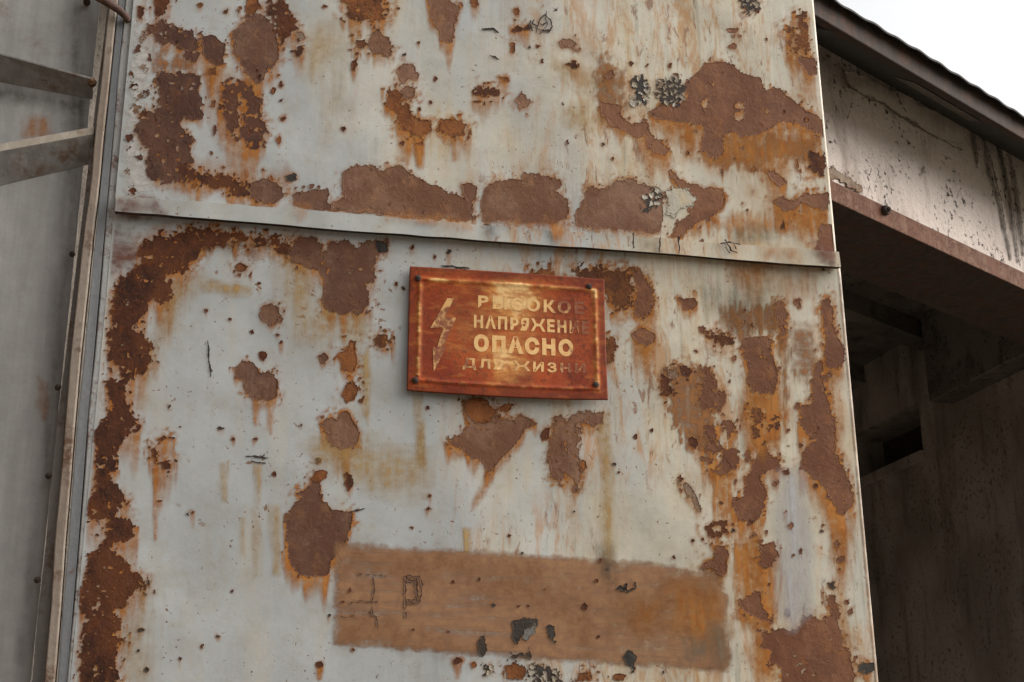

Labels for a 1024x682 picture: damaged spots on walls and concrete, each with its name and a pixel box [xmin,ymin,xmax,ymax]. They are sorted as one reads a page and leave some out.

peeling [122,13,824,240]
peeling [229,355,282,408]
peeling [284,235,389,322]
rust [524,260,638,365]
rust [814,294,846,391]
rust [72,222,292,682]
peeling [319,409,362,464]
peeling [444,397,609,497]
rust [631,264,804,675]
peeling [282,479,359,600]
rust [822,538,853,623]
peeling [737,590,860,682]